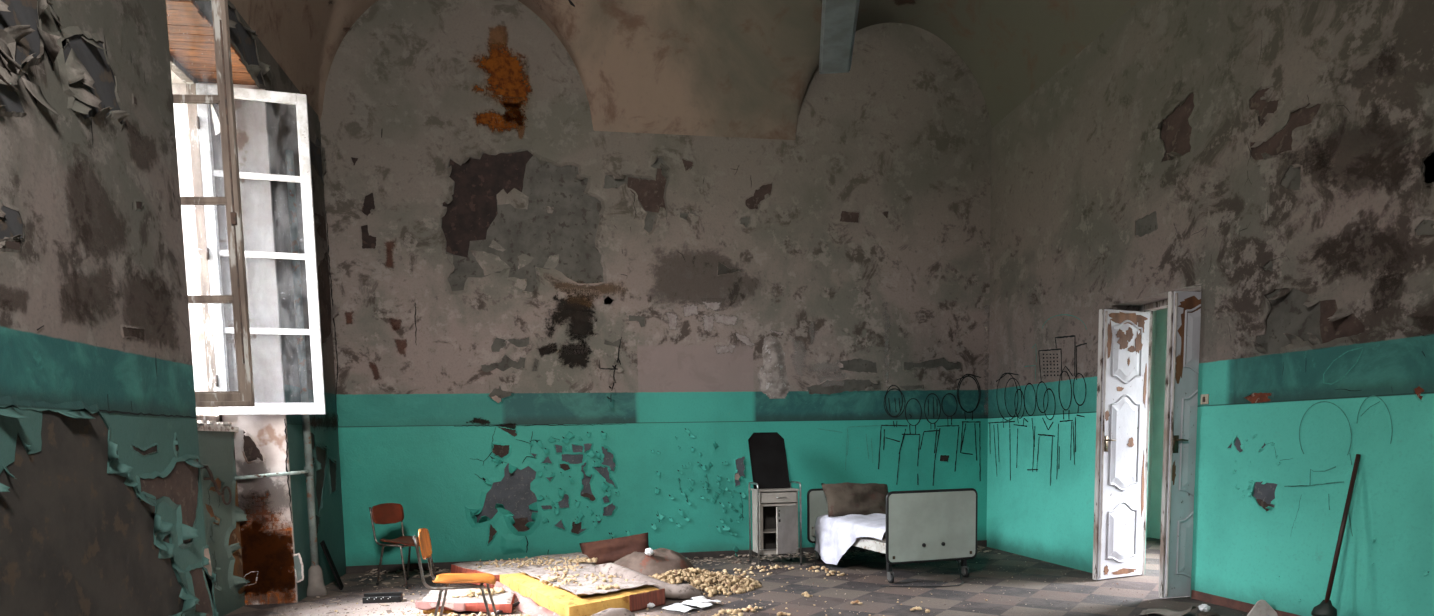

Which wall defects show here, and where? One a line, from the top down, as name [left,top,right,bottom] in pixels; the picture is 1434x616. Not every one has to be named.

peeling [437,145,698,306]
peeling [465,426,631,546]
peeling [1227,434,1280,514]